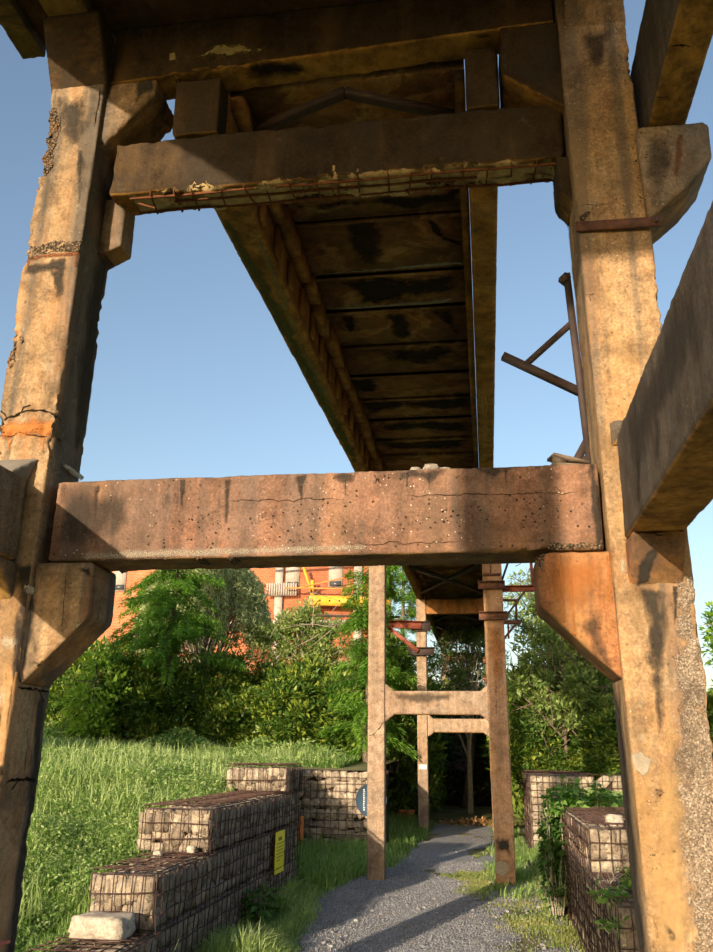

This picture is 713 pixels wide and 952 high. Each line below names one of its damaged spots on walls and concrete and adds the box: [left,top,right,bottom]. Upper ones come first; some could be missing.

spalling [42,107,61,173]
spalling [128,158,556,215]
water stain [316,190,458,210]
water stain [27,259,65,295]
spalling [27,240,81,259]
water stain [337,220,462,338]
water stain [392,346,454,364]
crack [0,405,61,441]
water stain [64,486,121,541]
crack [6,727,38,790]
spalling [655,574,713,952]